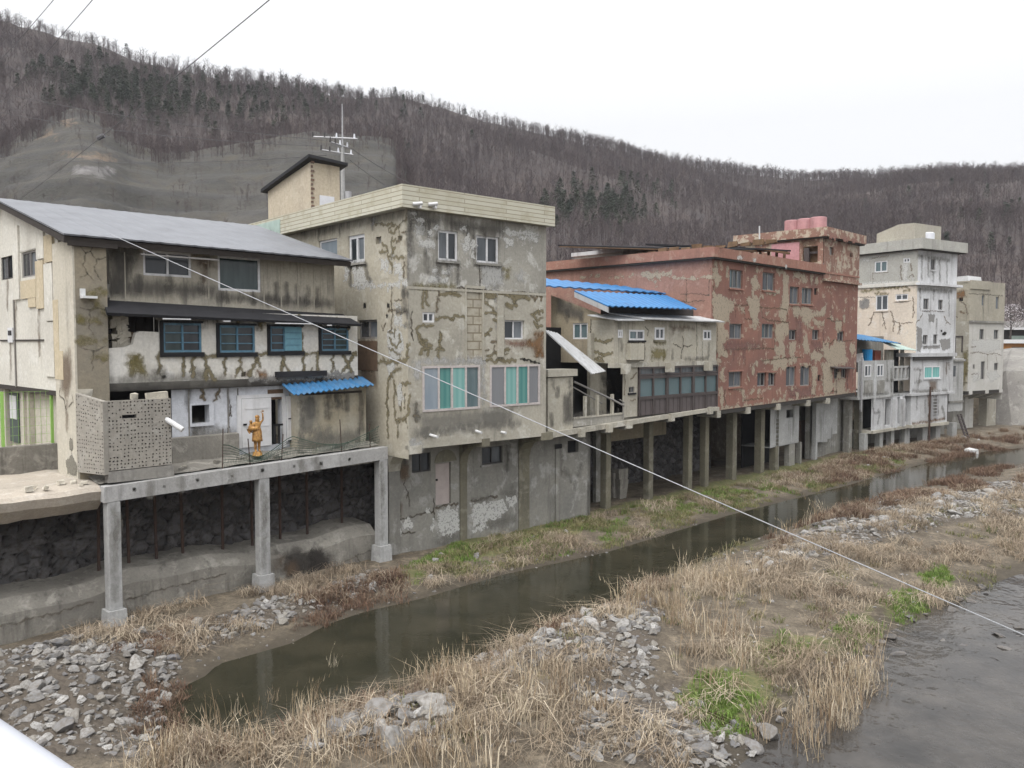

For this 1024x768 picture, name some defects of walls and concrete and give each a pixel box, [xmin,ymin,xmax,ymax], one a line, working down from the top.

crack [76,246,108,363]
water stain [118,354,231,394]
water stain [109,248,330,307]
water stain [249,370,376,384]
crack [156,217,545,438]
peeling [580,255,856,410]
crack [826,256,1002,344]